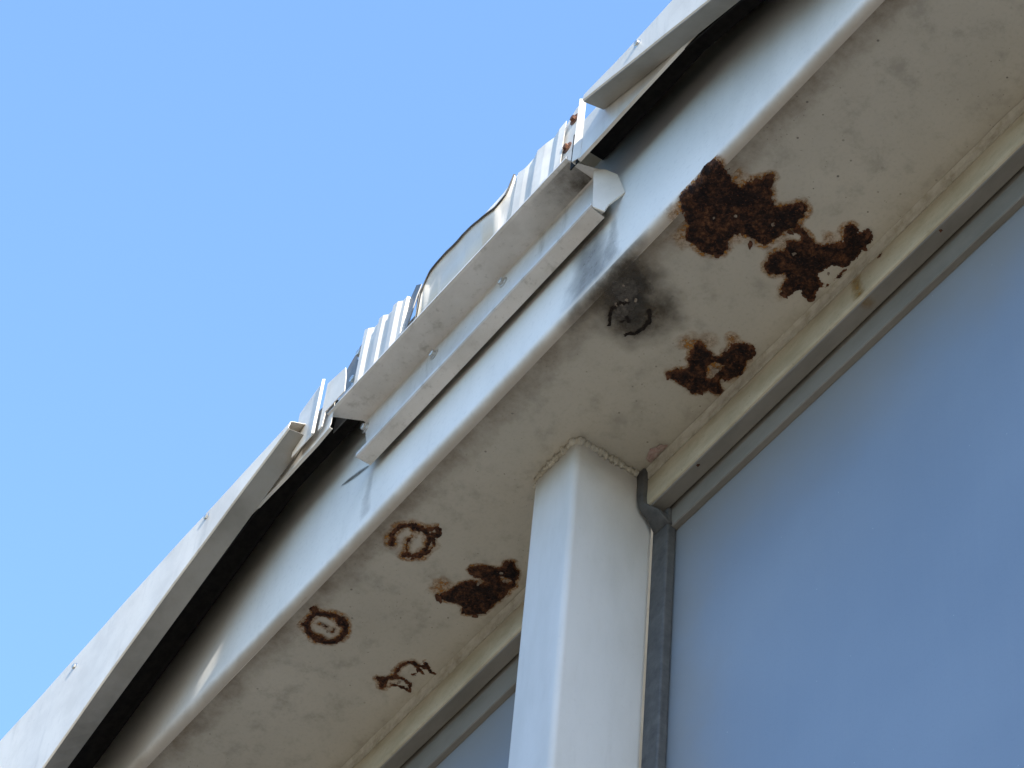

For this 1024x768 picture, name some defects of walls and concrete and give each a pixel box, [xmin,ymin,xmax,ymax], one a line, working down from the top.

rust [673,156,882,302]
rust [665,335,756,396]
rust [384,521,442,561]
rust [431,559,520,618]
rust [298,606,351,645]
rust [373,661,436,693]